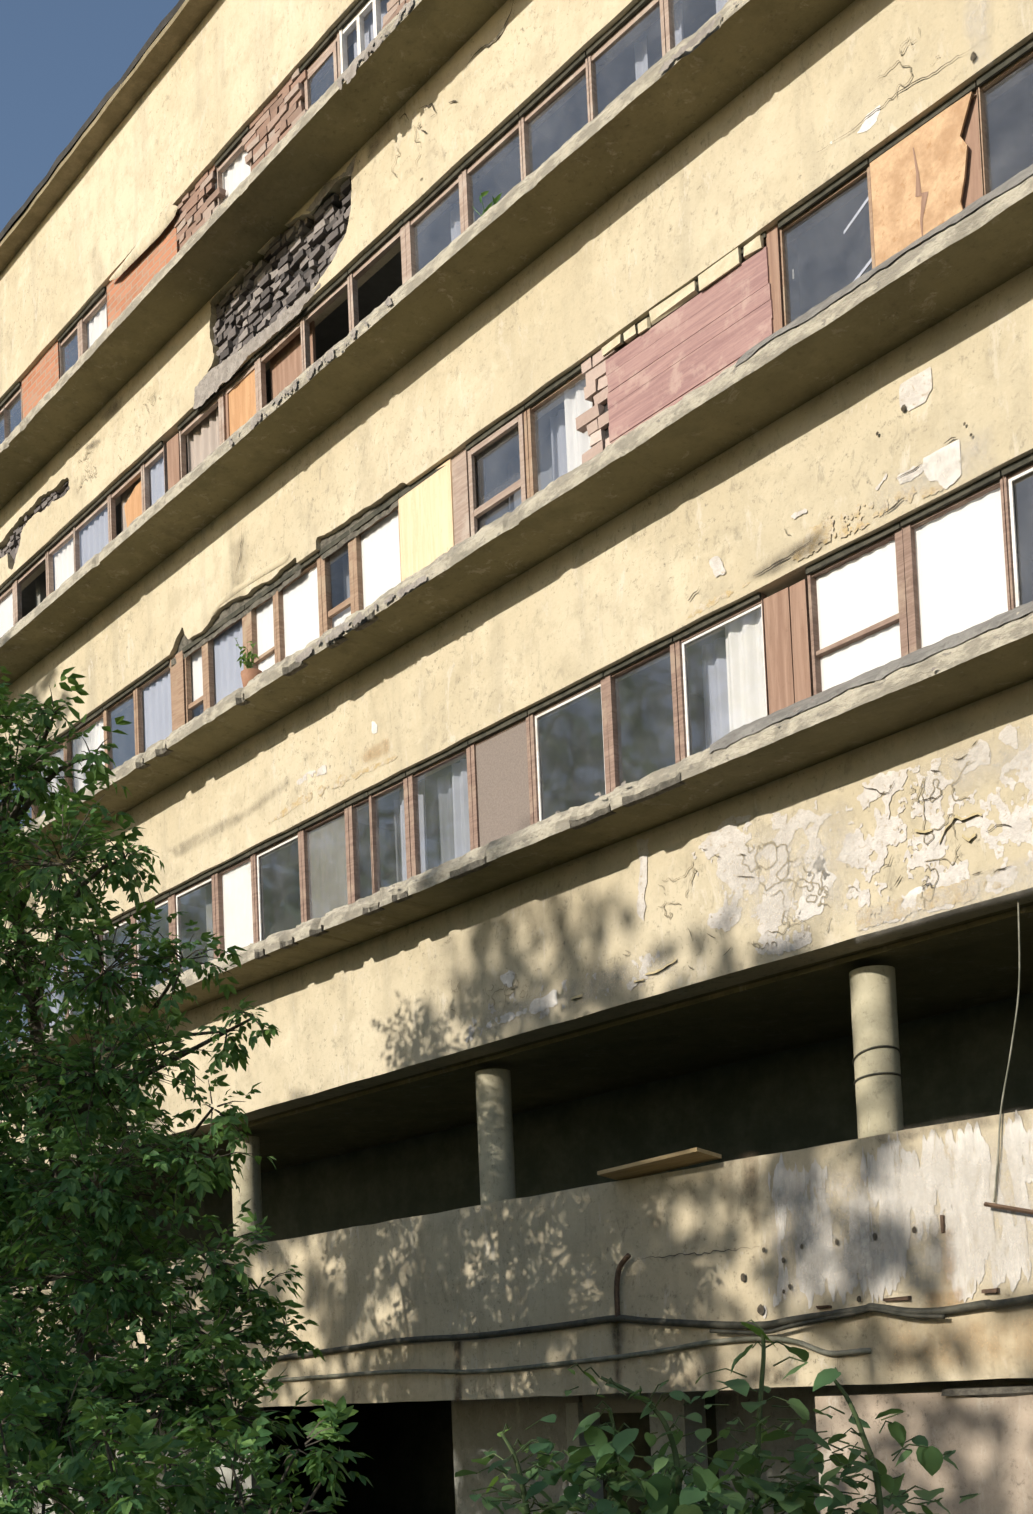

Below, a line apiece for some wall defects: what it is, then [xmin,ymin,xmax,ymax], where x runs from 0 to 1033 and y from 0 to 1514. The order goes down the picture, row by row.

crack [467,0,514,65]
crack [399,100,456,133]
crack [818,40,982,152]
flaking render [193,156,356,409]
peeling [899,367,932,411]
flaking render [0,481,70,563]
peeling [791,439,961,562]
peeling [692,724,1033,956]
peeling [465,970,567,1043]
peeling [763,1111,1033,1319]